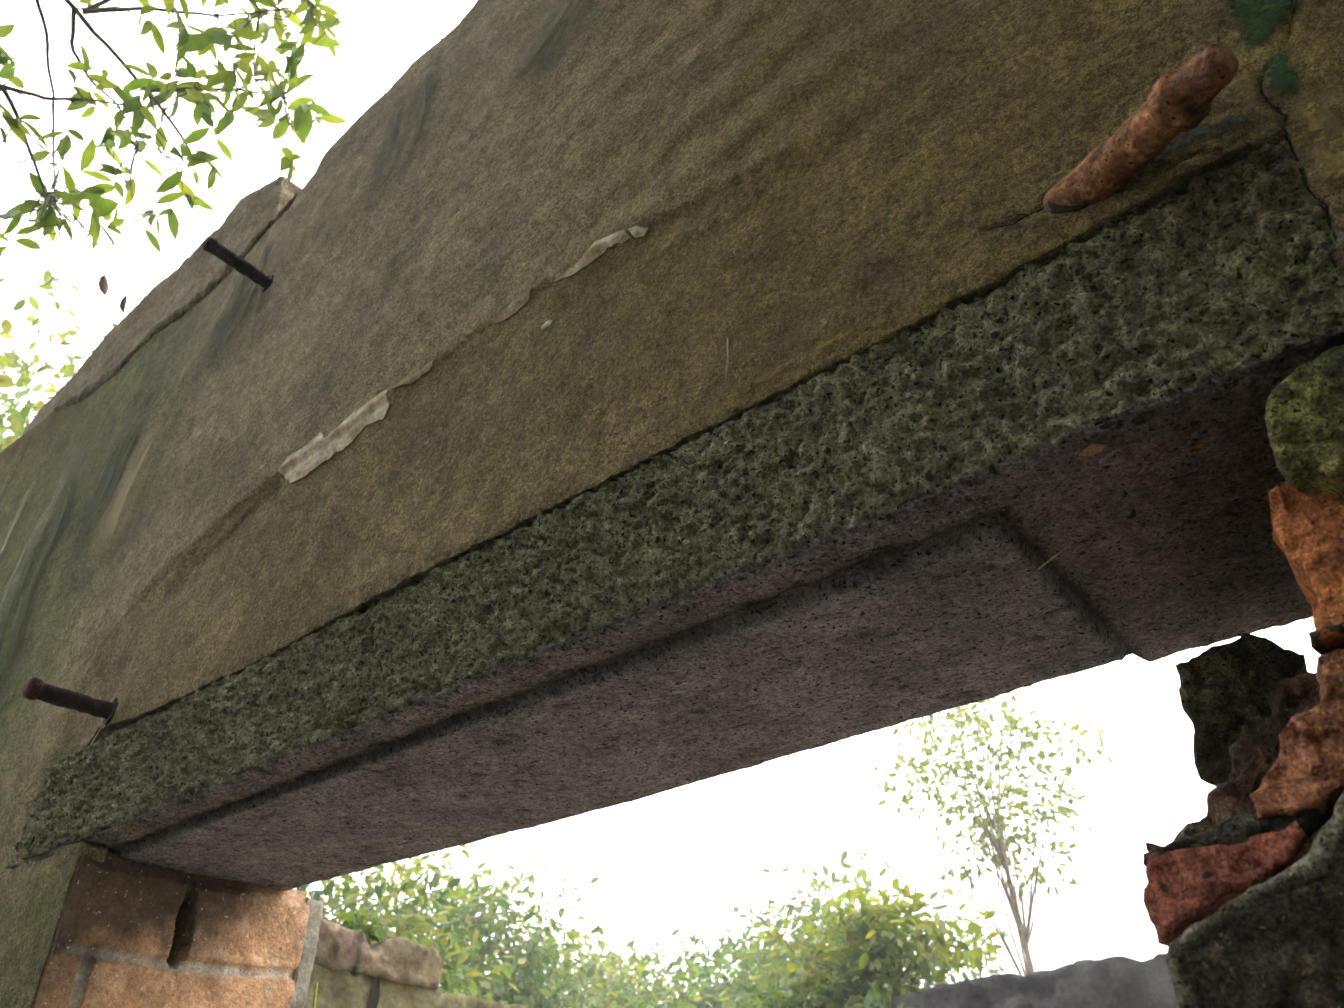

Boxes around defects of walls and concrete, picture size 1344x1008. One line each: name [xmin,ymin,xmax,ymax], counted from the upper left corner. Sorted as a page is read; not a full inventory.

crack [1259,2,1337,269]
flaking render [554,226,649,283]
flaking render [278,359,435,484]
spalling [1145,672,1321,852]